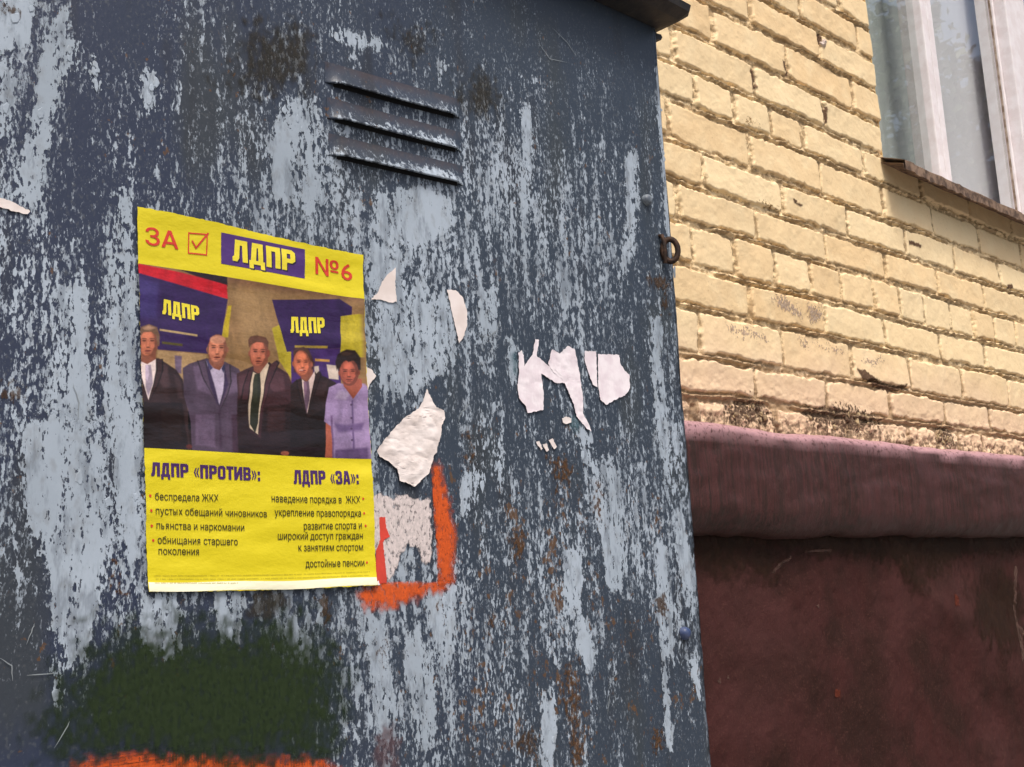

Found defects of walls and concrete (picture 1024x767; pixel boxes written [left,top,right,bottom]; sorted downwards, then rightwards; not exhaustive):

peeling [0,0,102,210]
peeling [264,96,333,219]
peeling [363,181,457,404]
corrosion [646,273,674,315]
peeling [12,183,187,710]
peeling [361,581,463,754]
corrosion [517,729,538,758]
corrosion [550,622,589,767]
corrosion [655,590,669,620]
peeling [648,315,702,752]
water stain [696,535,1024,588]
water stain [974,570,1024,654]